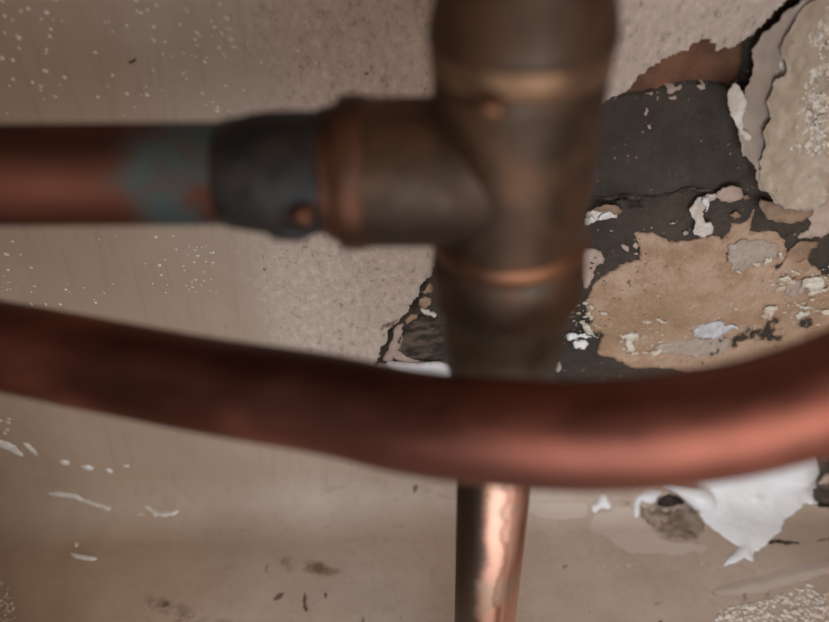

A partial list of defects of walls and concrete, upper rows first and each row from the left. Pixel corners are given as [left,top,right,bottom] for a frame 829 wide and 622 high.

flaking render [553,0,829,380]
flaking render [373,263,446,364]
flaking render [640,495,705,541]
flaking render [812,458,829,512]